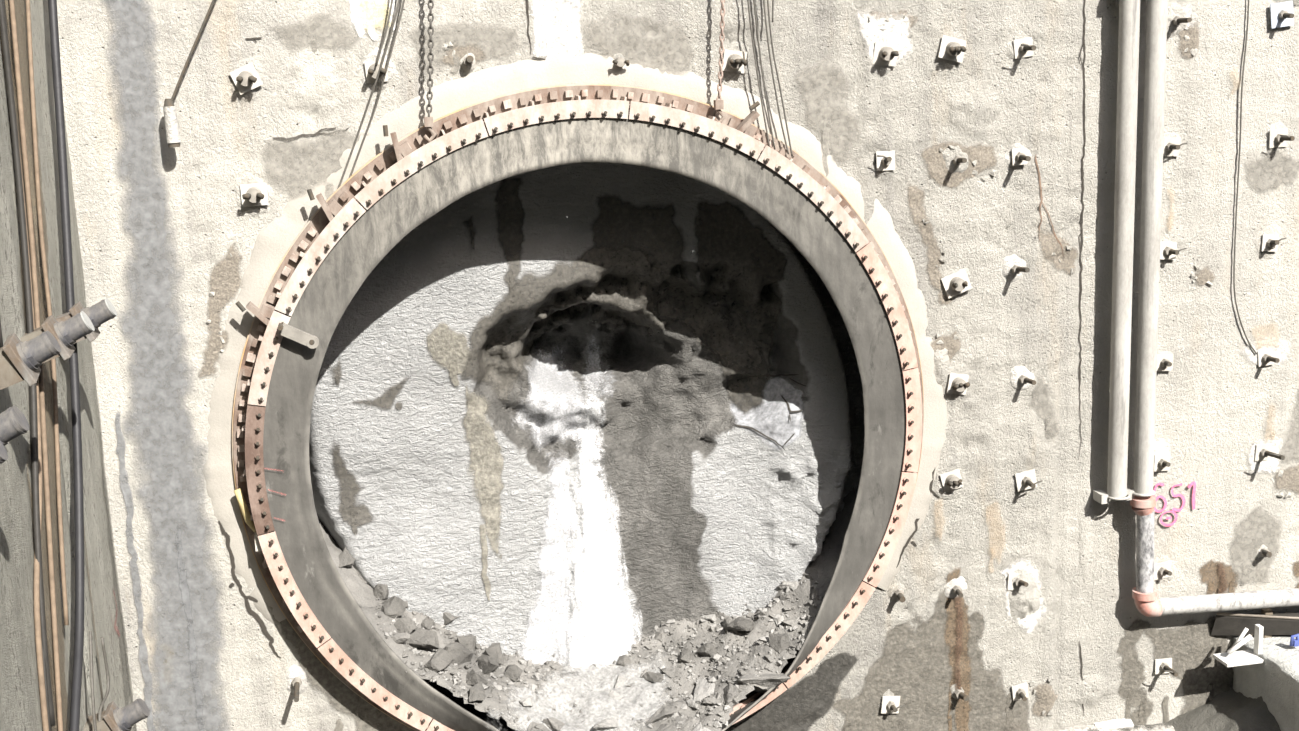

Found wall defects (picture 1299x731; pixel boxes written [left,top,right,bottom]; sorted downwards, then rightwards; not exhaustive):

crack [1035,0,1086,460]
rust [1218,563,1227,594]
rust [955,596,963,702]